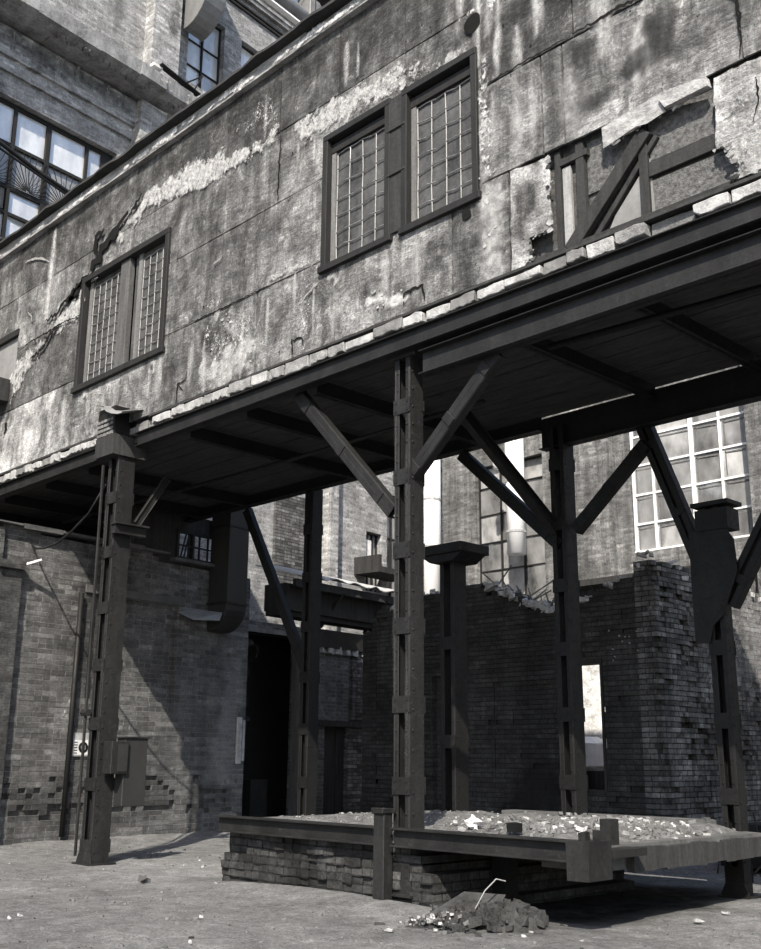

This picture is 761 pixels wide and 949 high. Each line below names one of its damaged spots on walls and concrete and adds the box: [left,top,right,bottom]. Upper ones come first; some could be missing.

peeling [273,1,358,64]
water stain [621,4,684,75]
crack [734,0,742,54]
peeling [208,74,254,111]
spalling [294,48,466,145]
water stain [562,87,610,111]
crack [752,77,760,122]
peeling [57,180,106,216]
spalling [116,103,279,243]
crack [22,192,142,359]
spalling [52,289,85,334]
spalling [9,339,46,404]